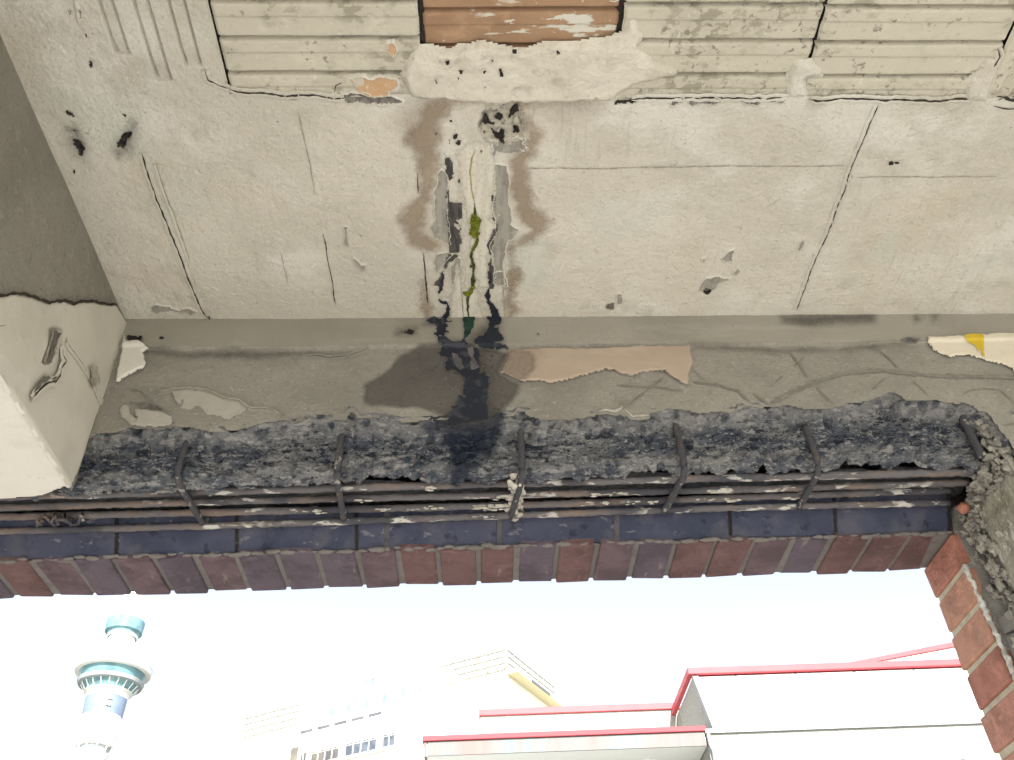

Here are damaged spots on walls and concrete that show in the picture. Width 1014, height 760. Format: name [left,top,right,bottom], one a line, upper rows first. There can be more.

crack [979,47,1005,76]
crack [0,291,118,306]
crack [138,153,212,320]
damp [400,101,449,249]
damp [364,142,519,426]
damp [507,122,547,252]
peeling [501,345,693,384]
crack [531,94,1014,311]
peeling [928,333,1014,371]
spalling [0,392,1014,538]